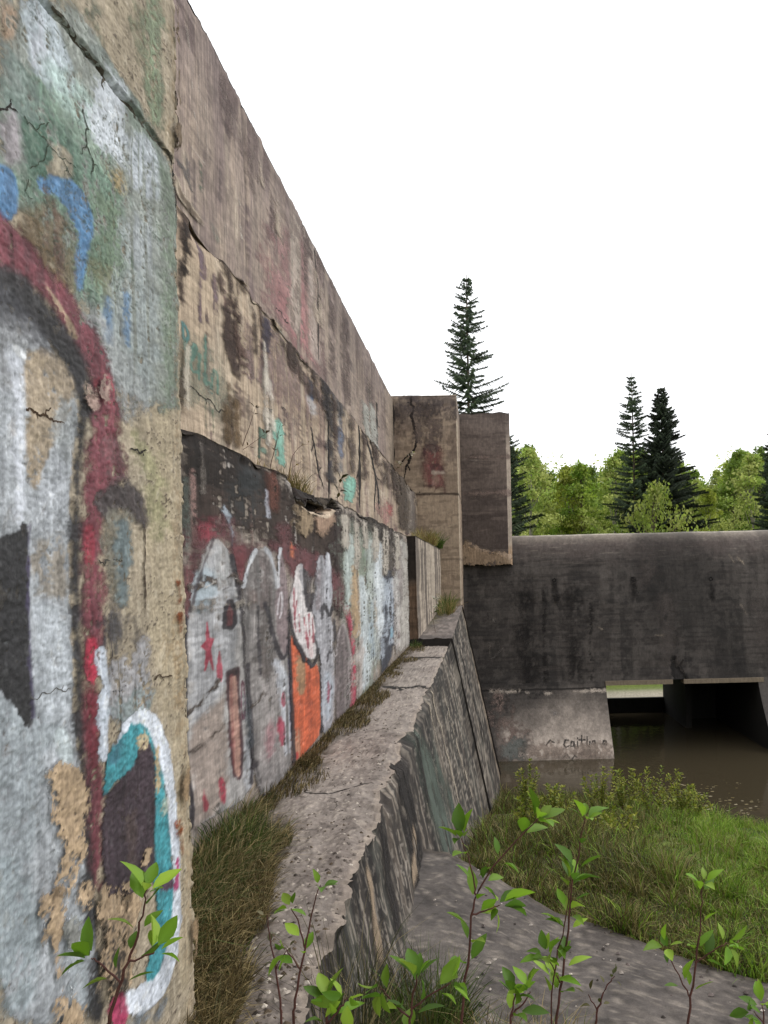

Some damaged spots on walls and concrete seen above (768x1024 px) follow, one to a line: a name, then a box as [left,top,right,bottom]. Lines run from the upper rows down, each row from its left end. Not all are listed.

crack [0,99,96,199]
crack [311,397,418,525]
spalling [292,488,336,537]
spalling [462,540,512,566]
peeling [38,760,143,1024]
peeling [141,847,152,867]